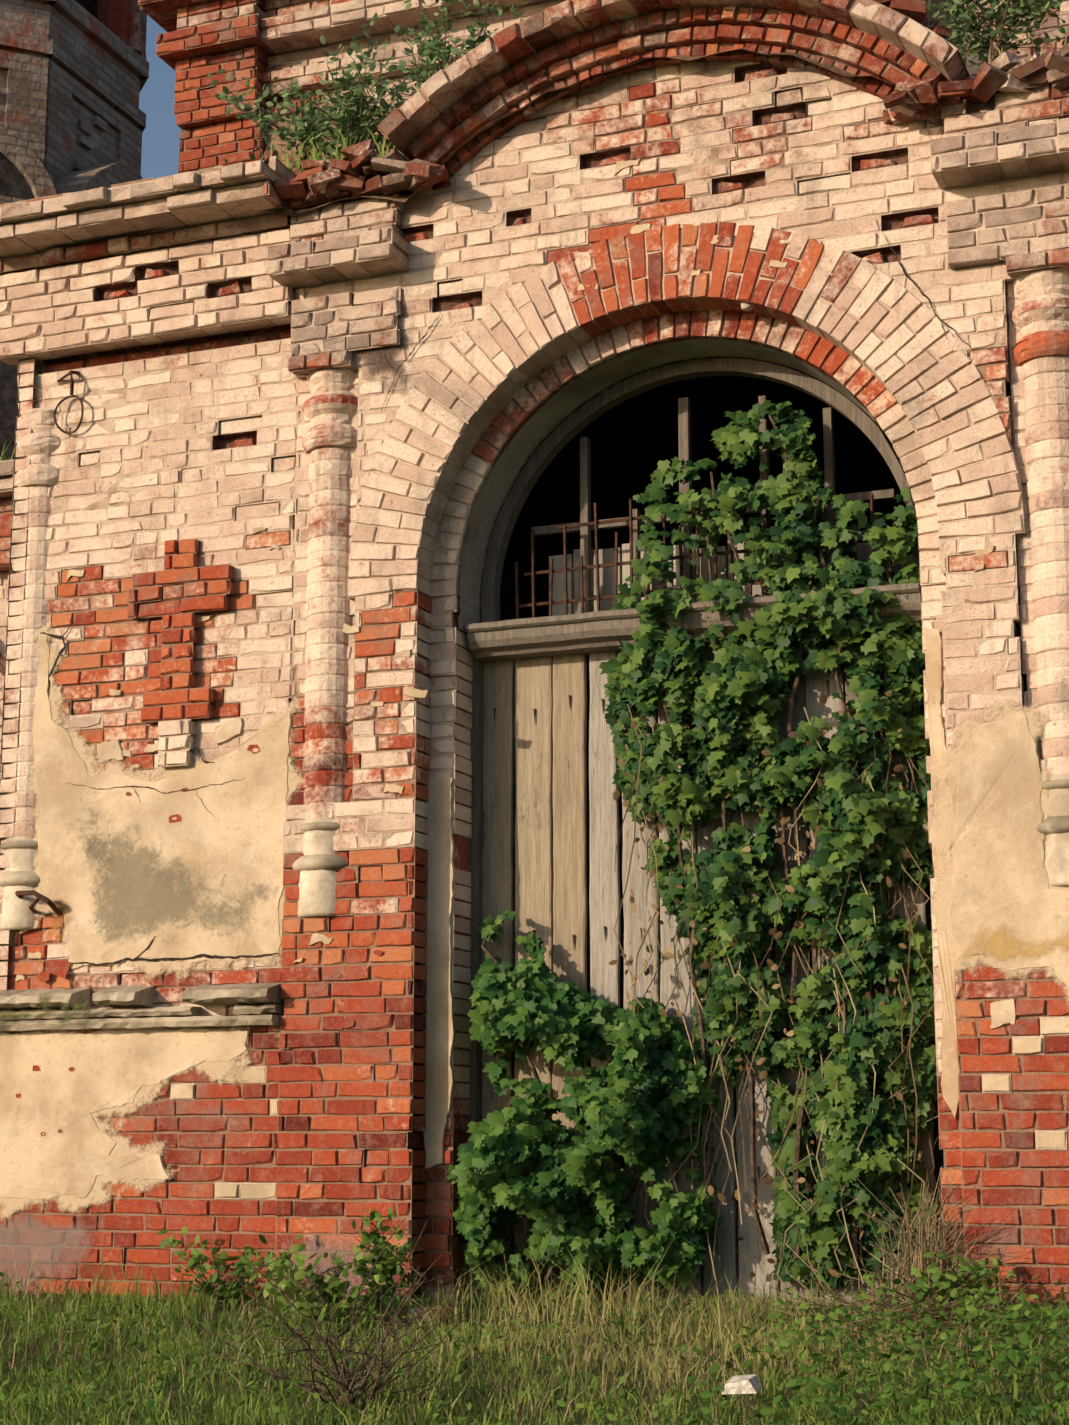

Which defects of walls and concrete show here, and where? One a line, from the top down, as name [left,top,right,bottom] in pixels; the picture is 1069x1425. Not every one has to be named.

crack [69,747,245,817]
leakage [86,835,262,940]
flaking render [7,566,455,1169]
flaking render [0,1017,276,1219]
flaking render [1037,1131,1066,1149]